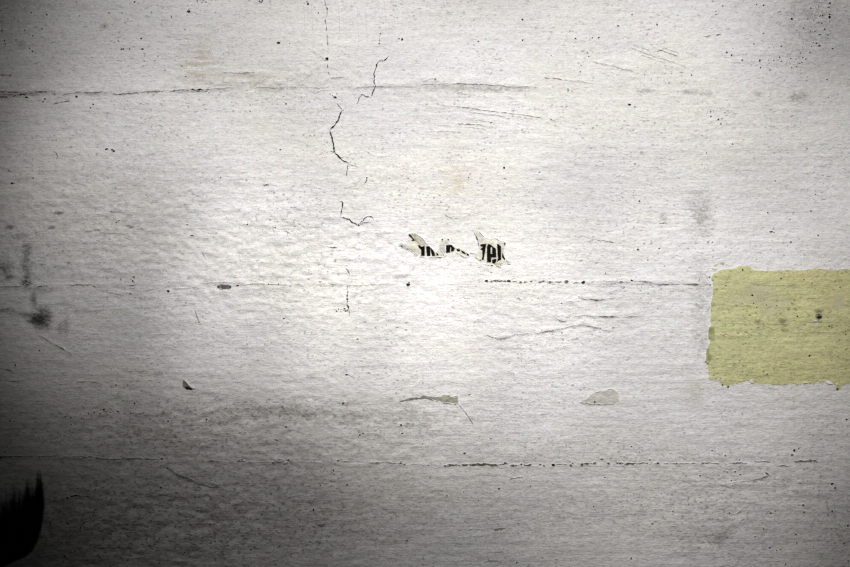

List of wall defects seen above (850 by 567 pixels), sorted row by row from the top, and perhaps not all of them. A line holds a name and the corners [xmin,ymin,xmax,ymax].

crack [0,0,392,185]
crack [339,201,375,227]
peeling [397,229,512,269]
spalling [400,393,474,425]
spalling [578,388,620,406]